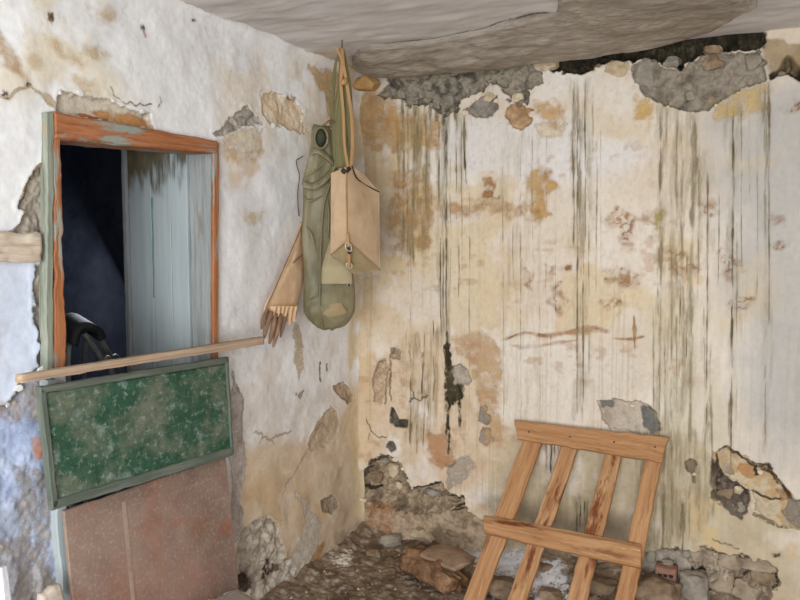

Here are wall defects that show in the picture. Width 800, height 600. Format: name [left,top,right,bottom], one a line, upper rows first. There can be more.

spalling [533,32,800,112]
spalling [10,162,42,233]
damp [379,64,543,200]
damp [572,121,597,246]
damp [690,122,709,225]
damp [410,241,464,454]
damp [671,295,693,386]
peeling [0,265,56,600]
spalling [362,441,487,551]
damp [656,488,690,551]
peeling [710,448,800,530]
spalling [642,546,781,600]